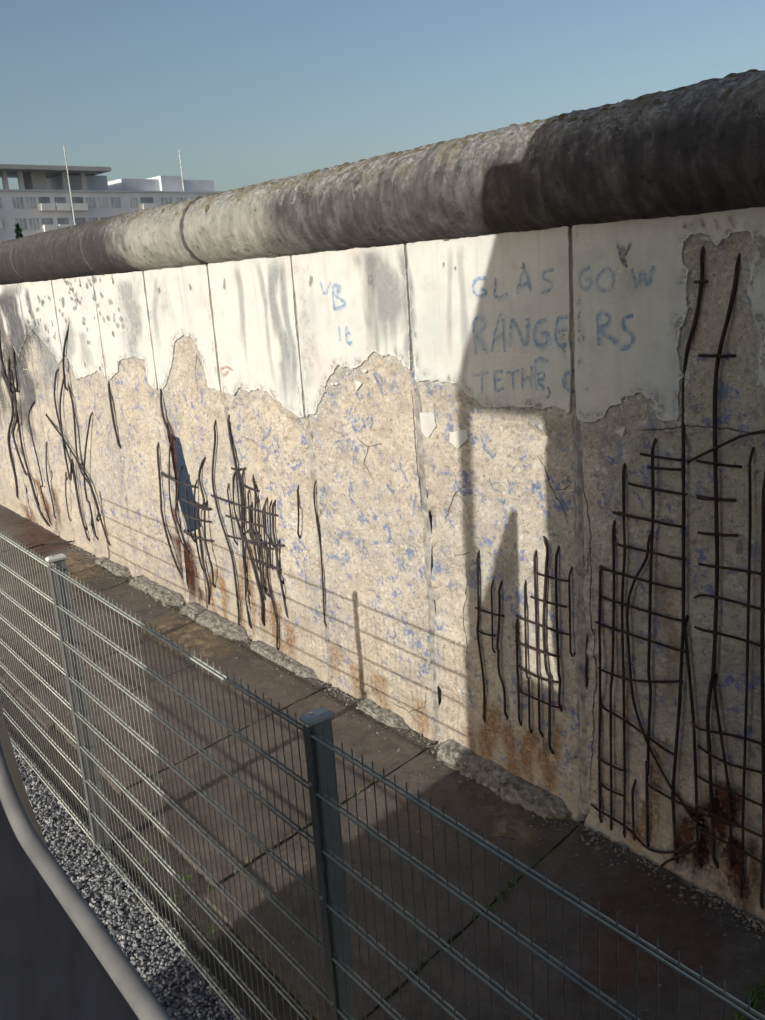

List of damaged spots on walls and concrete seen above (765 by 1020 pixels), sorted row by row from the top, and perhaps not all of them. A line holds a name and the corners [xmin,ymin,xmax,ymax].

damp [0,291,56,436]
damp [269,269,289,369]
rust [166,418,178,484]
rust [172,509,226,615]
spalling [0,231,765,923]
rust [480,710,559,787]
rust [677,783,765,910]